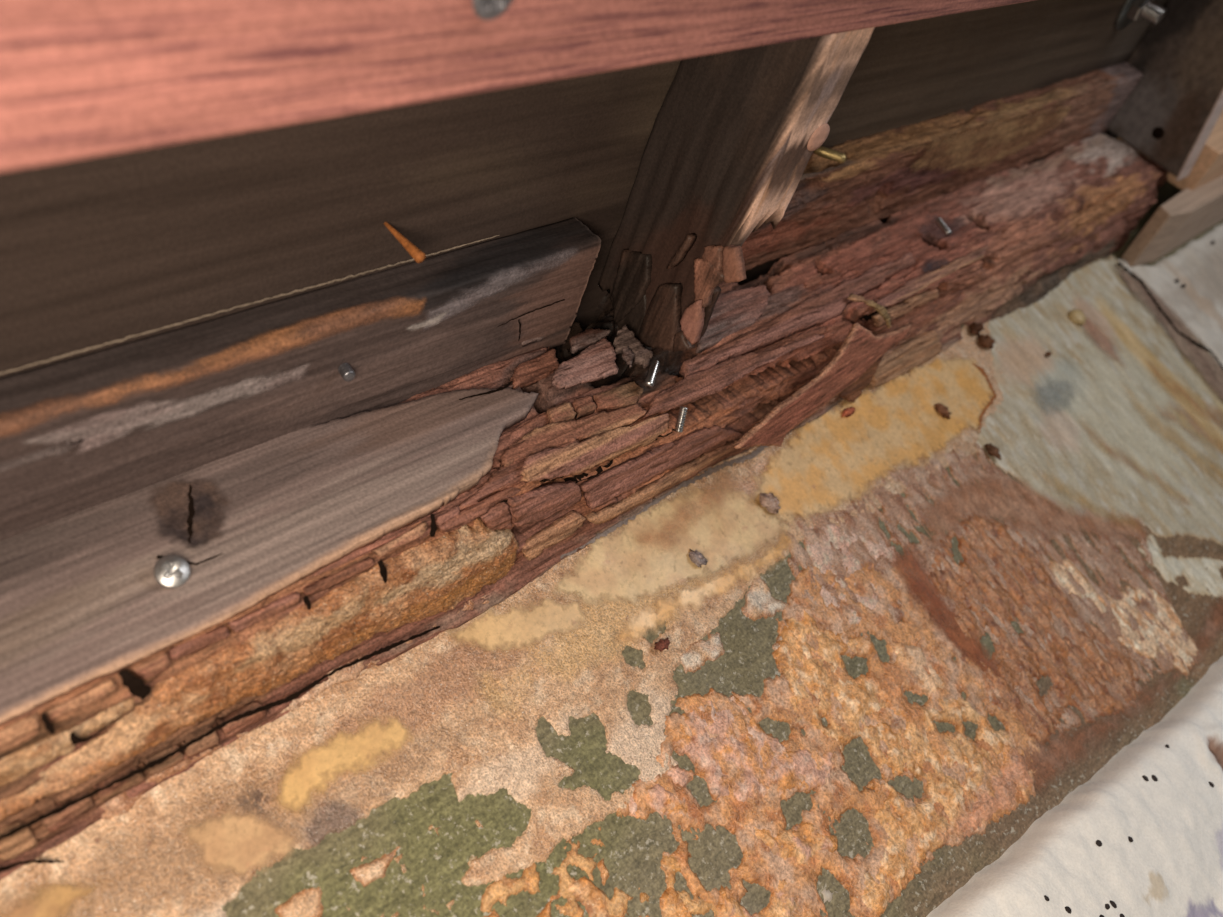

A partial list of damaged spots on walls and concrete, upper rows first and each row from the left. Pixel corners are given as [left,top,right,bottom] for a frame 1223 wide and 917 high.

crack [156,485,223,566]
peeling [480,562,1040,917]